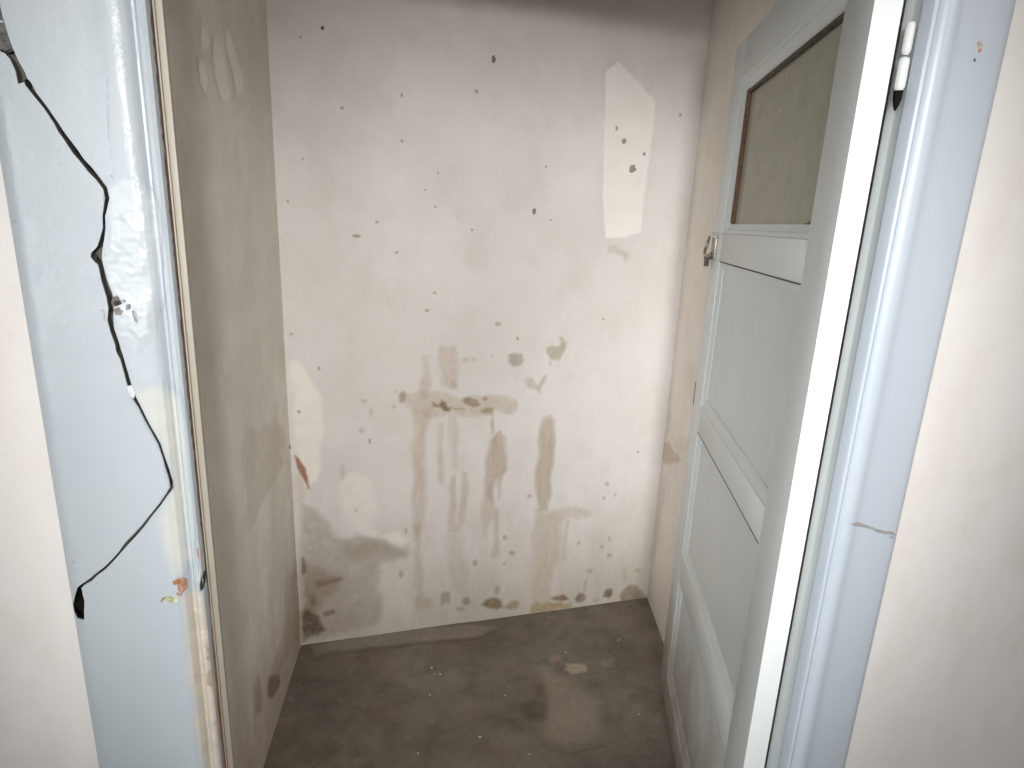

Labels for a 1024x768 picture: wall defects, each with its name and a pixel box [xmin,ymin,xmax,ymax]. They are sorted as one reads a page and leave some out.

crack [24,79,173,588]
peeling [111,296,138,321]
rust [292,453,313,503]
damp [269,334,615,675]
crack [849,522,896,539]